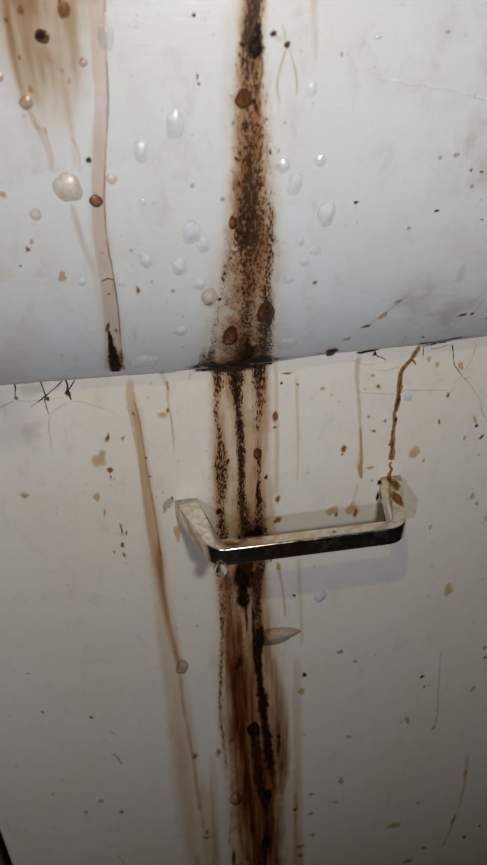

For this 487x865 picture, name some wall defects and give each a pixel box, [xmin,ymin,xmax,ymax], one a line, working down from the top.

crack [38,380,74,411]
rust [199,0,280,546]
rust [376,336,424,505]
rust [218,560,286,865]